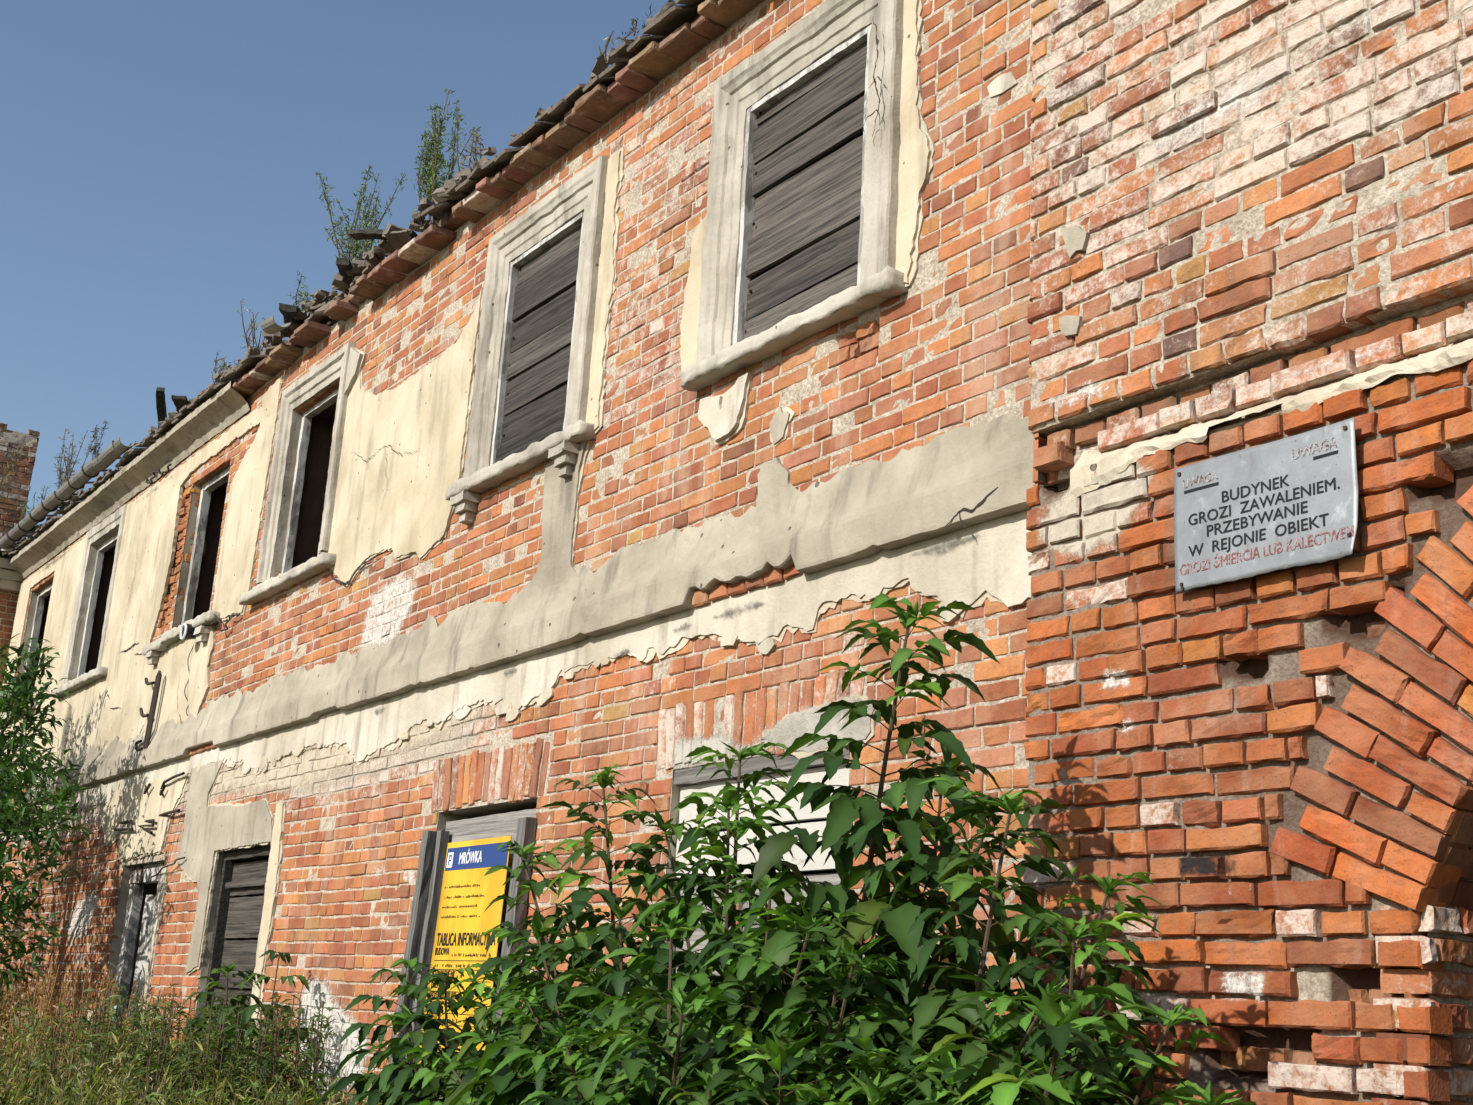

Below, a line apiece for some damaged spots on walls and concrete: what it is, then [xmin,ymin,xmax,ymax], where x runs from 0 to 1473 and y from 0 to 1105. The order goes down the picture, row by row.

flaking render [317,287,484,588]
flaking render [529,147,625,592]
flaking render [698,372,754,446]
flaking render [756,407,795,512]
crack [945,487,998,530]
flaking render [1047,338,1473,501]
flaking render [46,509,1032,1067]